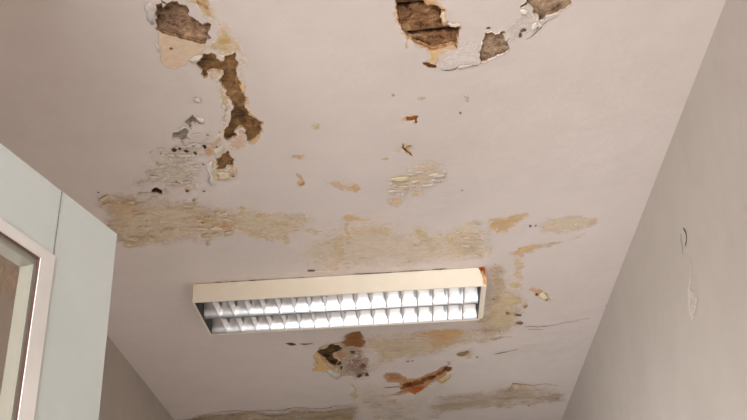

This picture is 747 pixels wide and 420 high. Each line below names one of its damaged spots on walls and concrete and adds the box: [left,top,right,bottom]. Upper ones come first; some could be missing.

spalling [395,0,572,71]
spalling [97,0,263,247]
leakage [490,214,528,232]
leakage [479,242,560,342]
spalling [312,331,369,380]